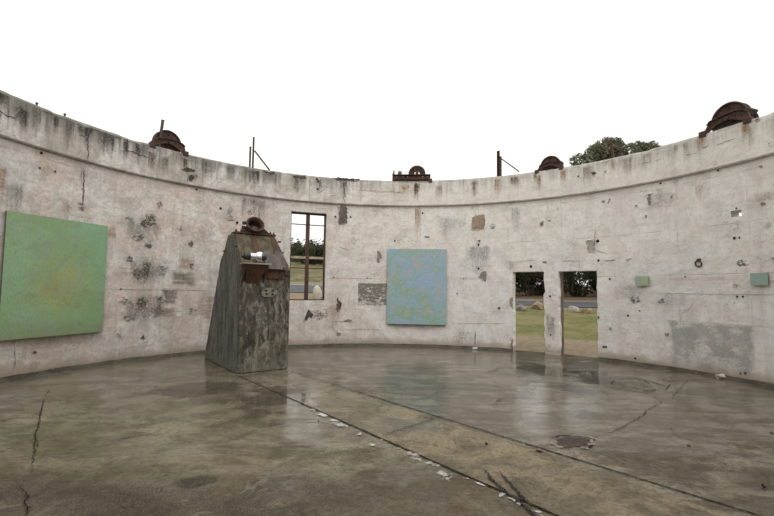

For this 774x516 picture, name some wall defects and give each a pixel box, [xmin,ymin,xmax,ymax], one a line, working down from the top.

crack [79,130,91,203]
spalling [338,205,349,225]
spalling [471,214,496,231]
spalling [550,435,597,449]
crack [19,390,49,516]